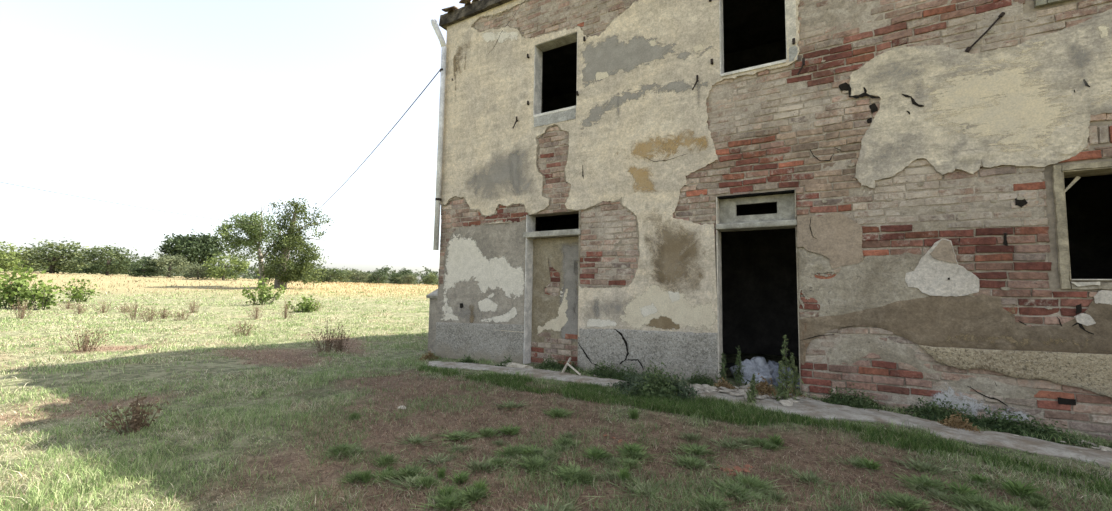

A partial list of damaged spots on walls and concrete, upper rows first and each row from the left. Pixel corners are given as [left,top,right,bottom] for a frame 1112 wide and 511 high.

flaking render [471,0,714,87]
flaking render [673,0,1112,327]
peeling [438,124,716,367]
water stain [650,226,703,291]
crack [578,329,644,370]
flaking render [800,325,1112,440]